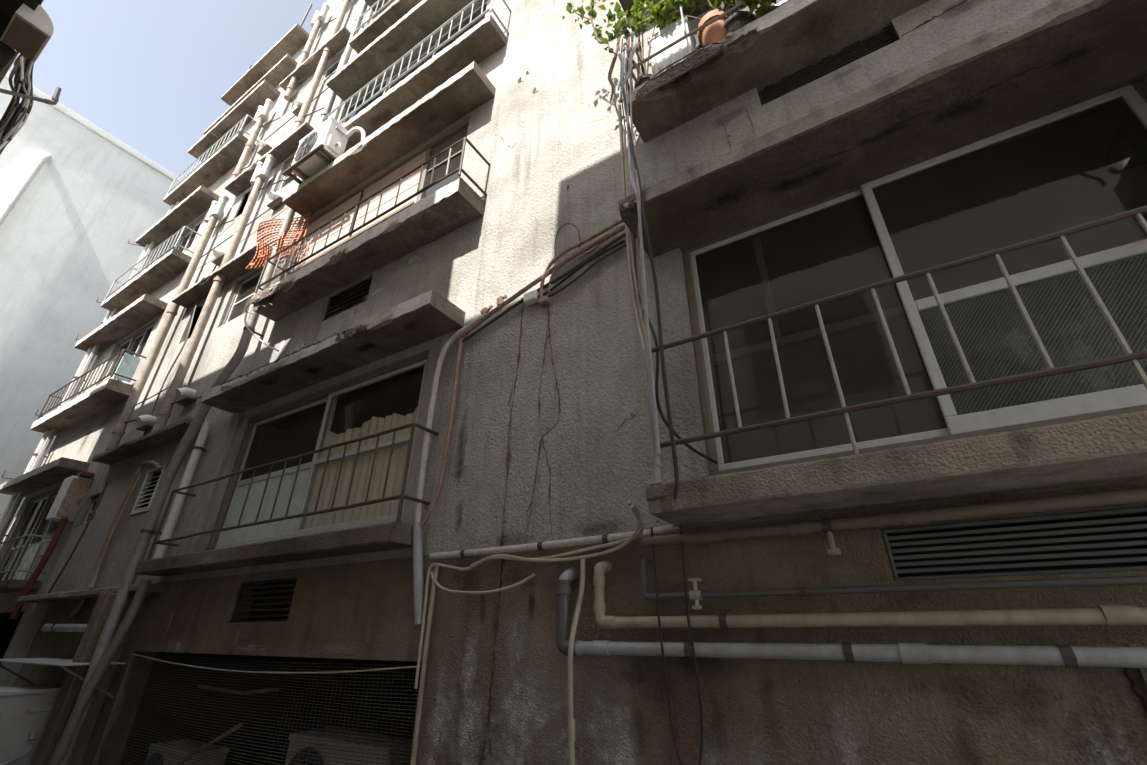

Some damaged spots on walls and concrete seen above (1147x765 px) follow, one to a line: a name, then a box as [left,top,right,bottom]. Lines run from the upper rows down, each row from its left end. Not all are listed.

crack [481,307,561,765]
crack [1123,668,1147,714]